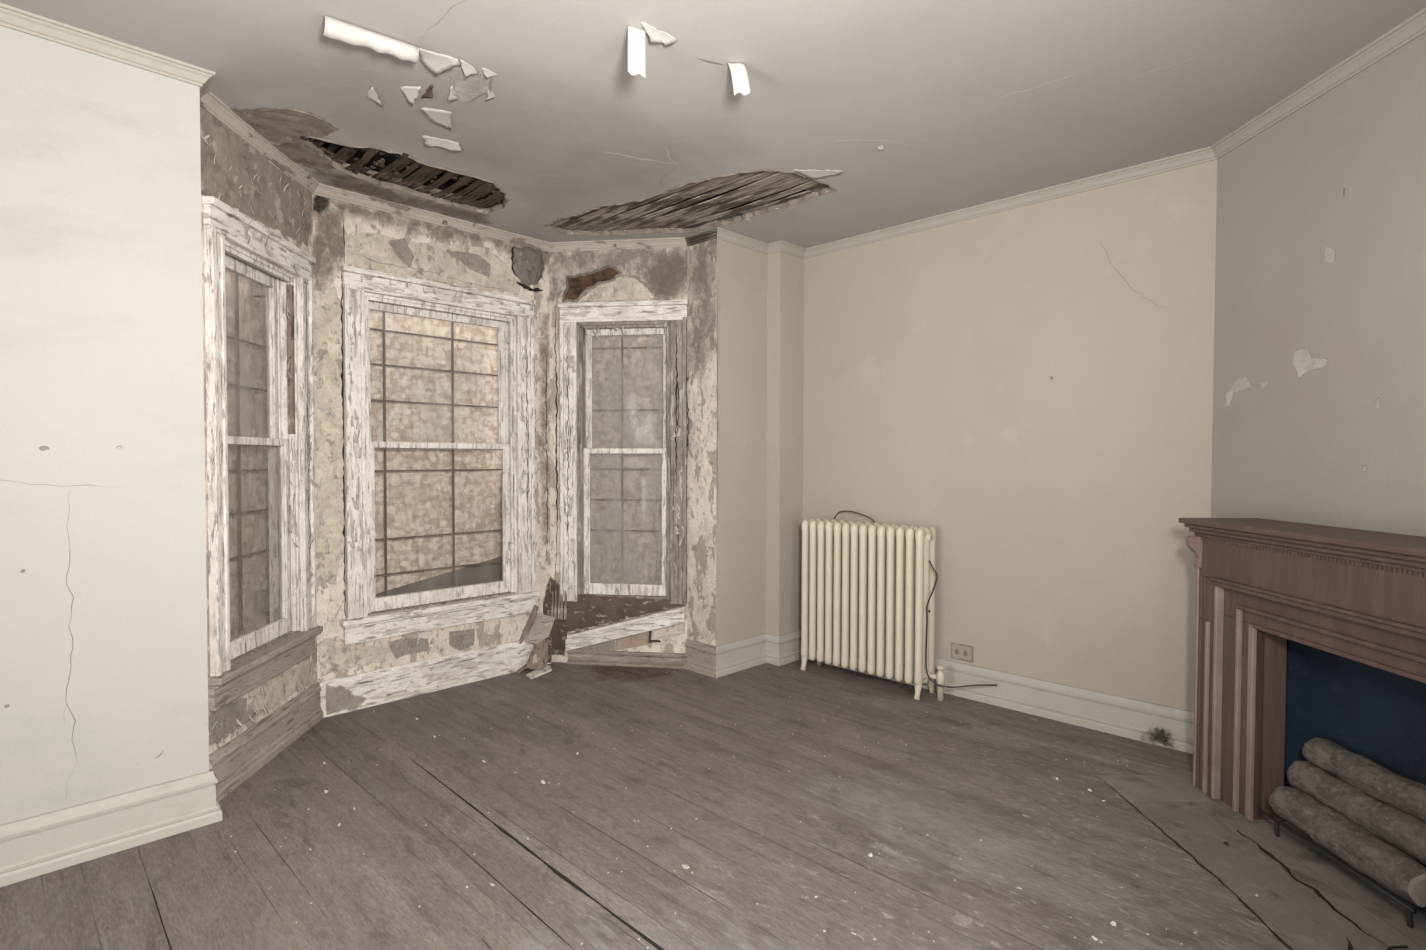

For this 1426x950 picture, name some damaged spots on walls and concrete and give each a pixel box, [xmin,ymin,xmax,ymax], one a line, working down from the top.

peeling [323,15,498,152]
peeling [628,22,678,78]
peeling [697,58,750,96]
peeling [792,169,843,179]
peeling [1292,348,1328,378]
crack [4,480,133,796]